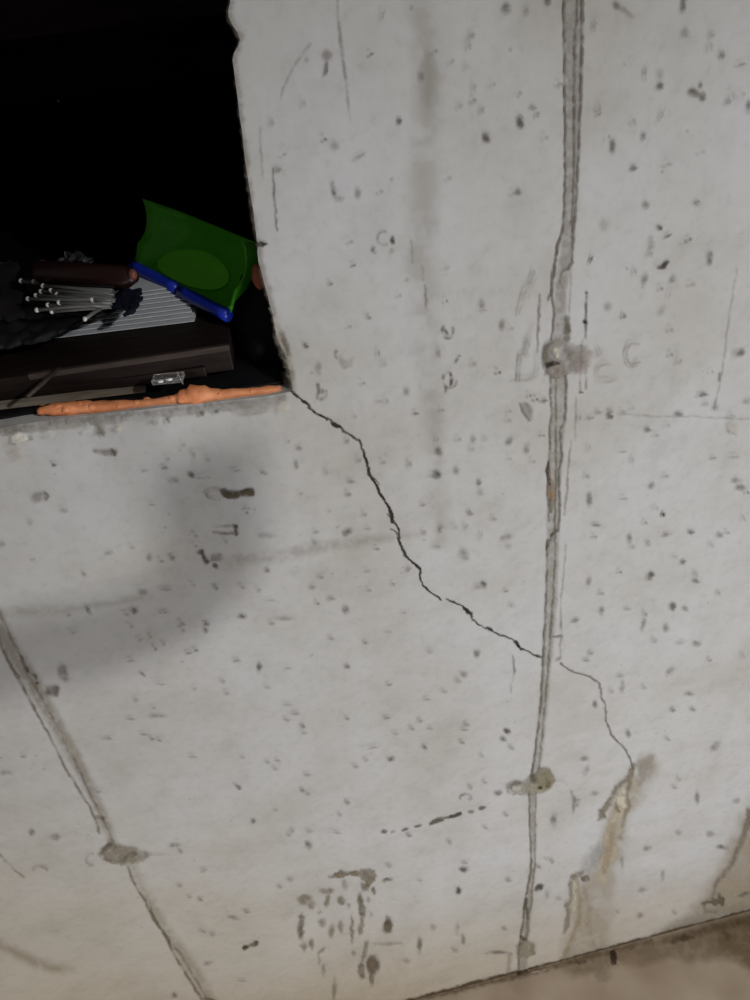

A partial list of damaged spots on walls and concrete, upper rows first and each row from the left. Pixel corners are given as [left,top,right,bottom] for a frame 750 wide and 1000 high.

crack [291,390,633,768]
water stain [446,761,649,993]